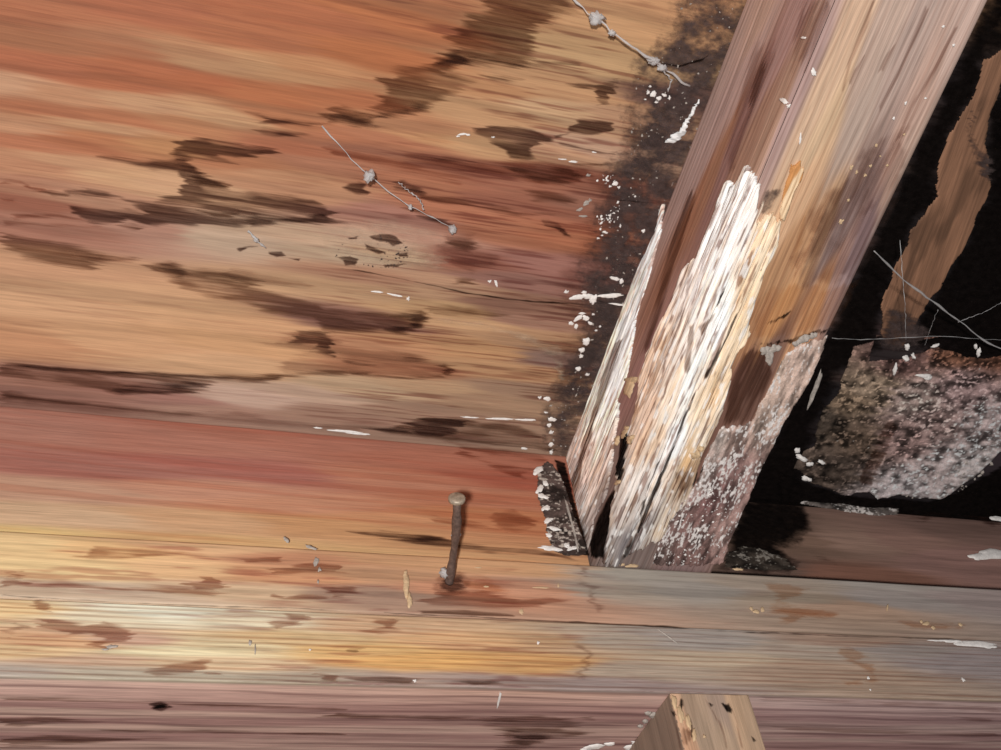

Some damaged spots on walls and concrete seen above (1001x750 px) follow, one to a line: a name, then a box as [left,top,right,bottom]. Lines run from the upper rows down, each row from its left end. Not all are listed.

water stain [73,140,335,224]
water stain [479,127,550,157]
water stain [335,234,408,268]
water stain [533,0,744,556]
water stain [653,0,1001,573]
spalling [614,426,635,486]